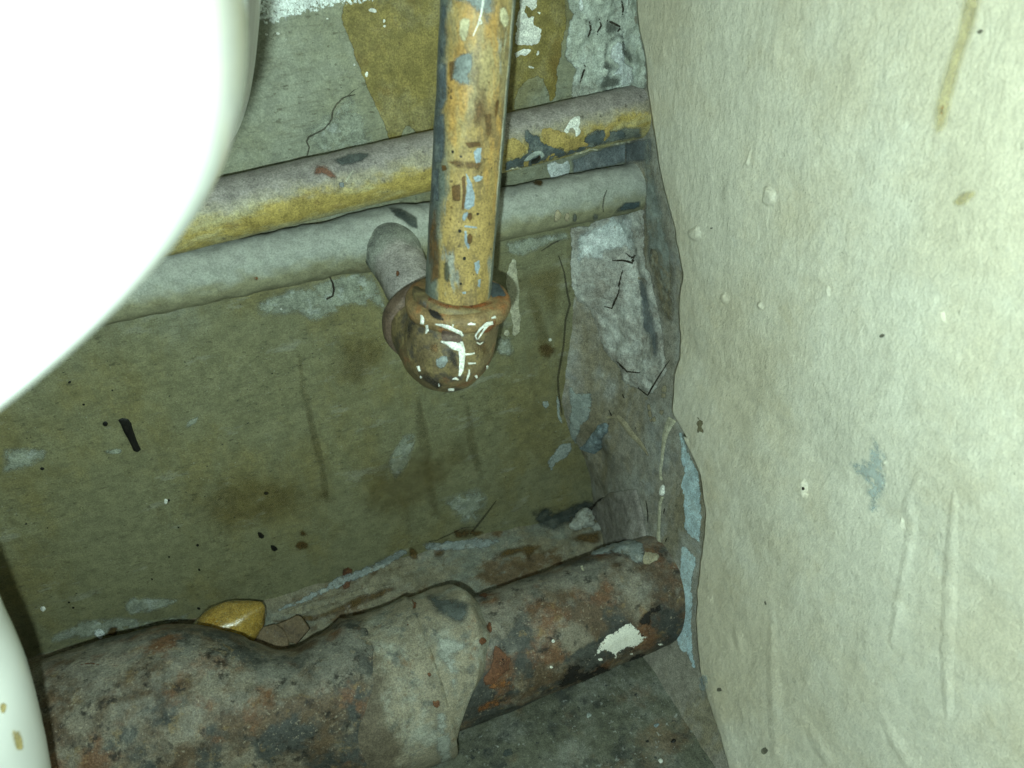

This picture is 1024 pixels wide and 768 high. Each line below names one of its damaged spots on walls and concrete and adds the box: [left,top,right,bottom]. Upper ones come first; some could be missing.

spalling [565,0,647,98]
crack [306,89,357,156]
spalling [570,210,670,396]